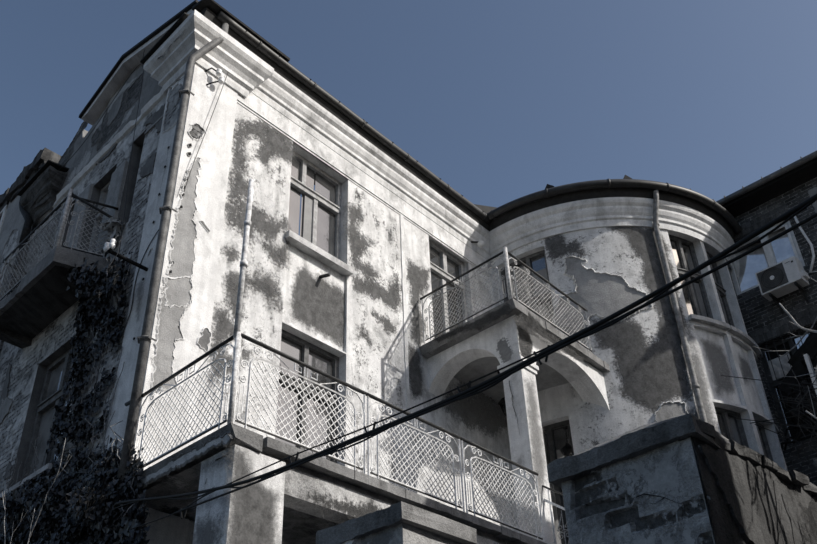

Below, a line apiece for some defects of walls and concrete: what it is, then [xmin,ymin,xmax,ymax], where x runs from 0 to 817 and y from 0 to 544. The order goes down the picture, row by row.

spalling [58,73,143,184]
flaking render [139,152,167,178]
spalling [145,82,183,134]
spalling [0,228,20,297]
peeling [196,119,431,419]
peeling [541,226,693,422]
spalling [136,431,233,489]
peeling [574,440,714,544]
flaking render [698,444,806,544]